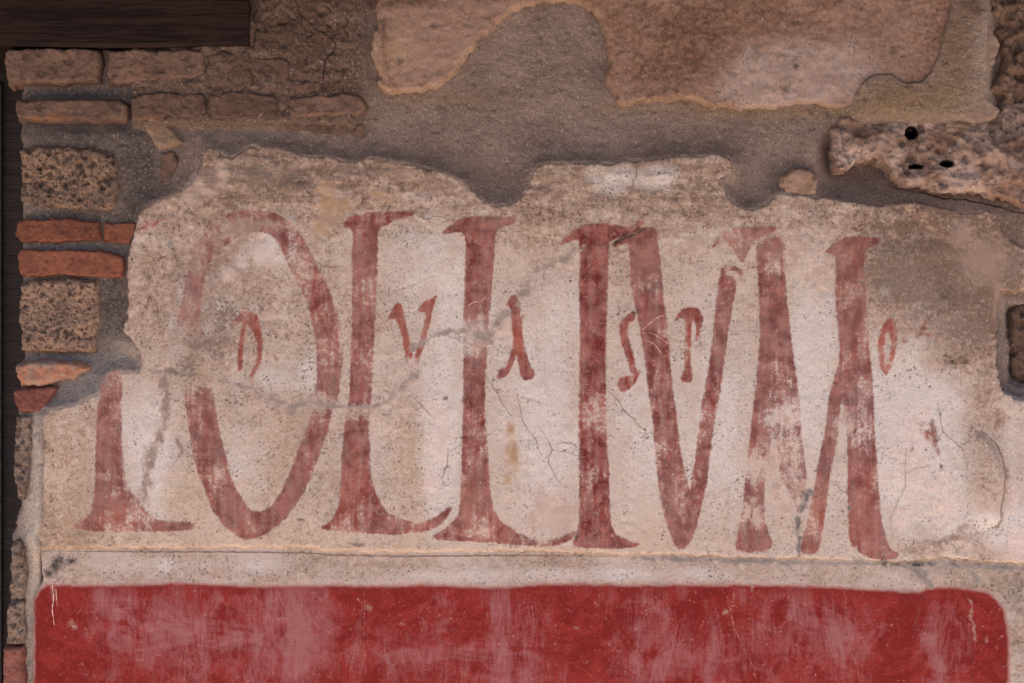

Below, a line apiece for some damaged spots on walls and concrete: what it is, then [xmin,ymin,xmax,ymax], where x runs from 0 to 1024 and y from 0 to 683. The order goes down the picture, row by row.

flaking render [984,26,1000,75]
flaking render [959,86,1000,124]
crack [149,250,582,486]